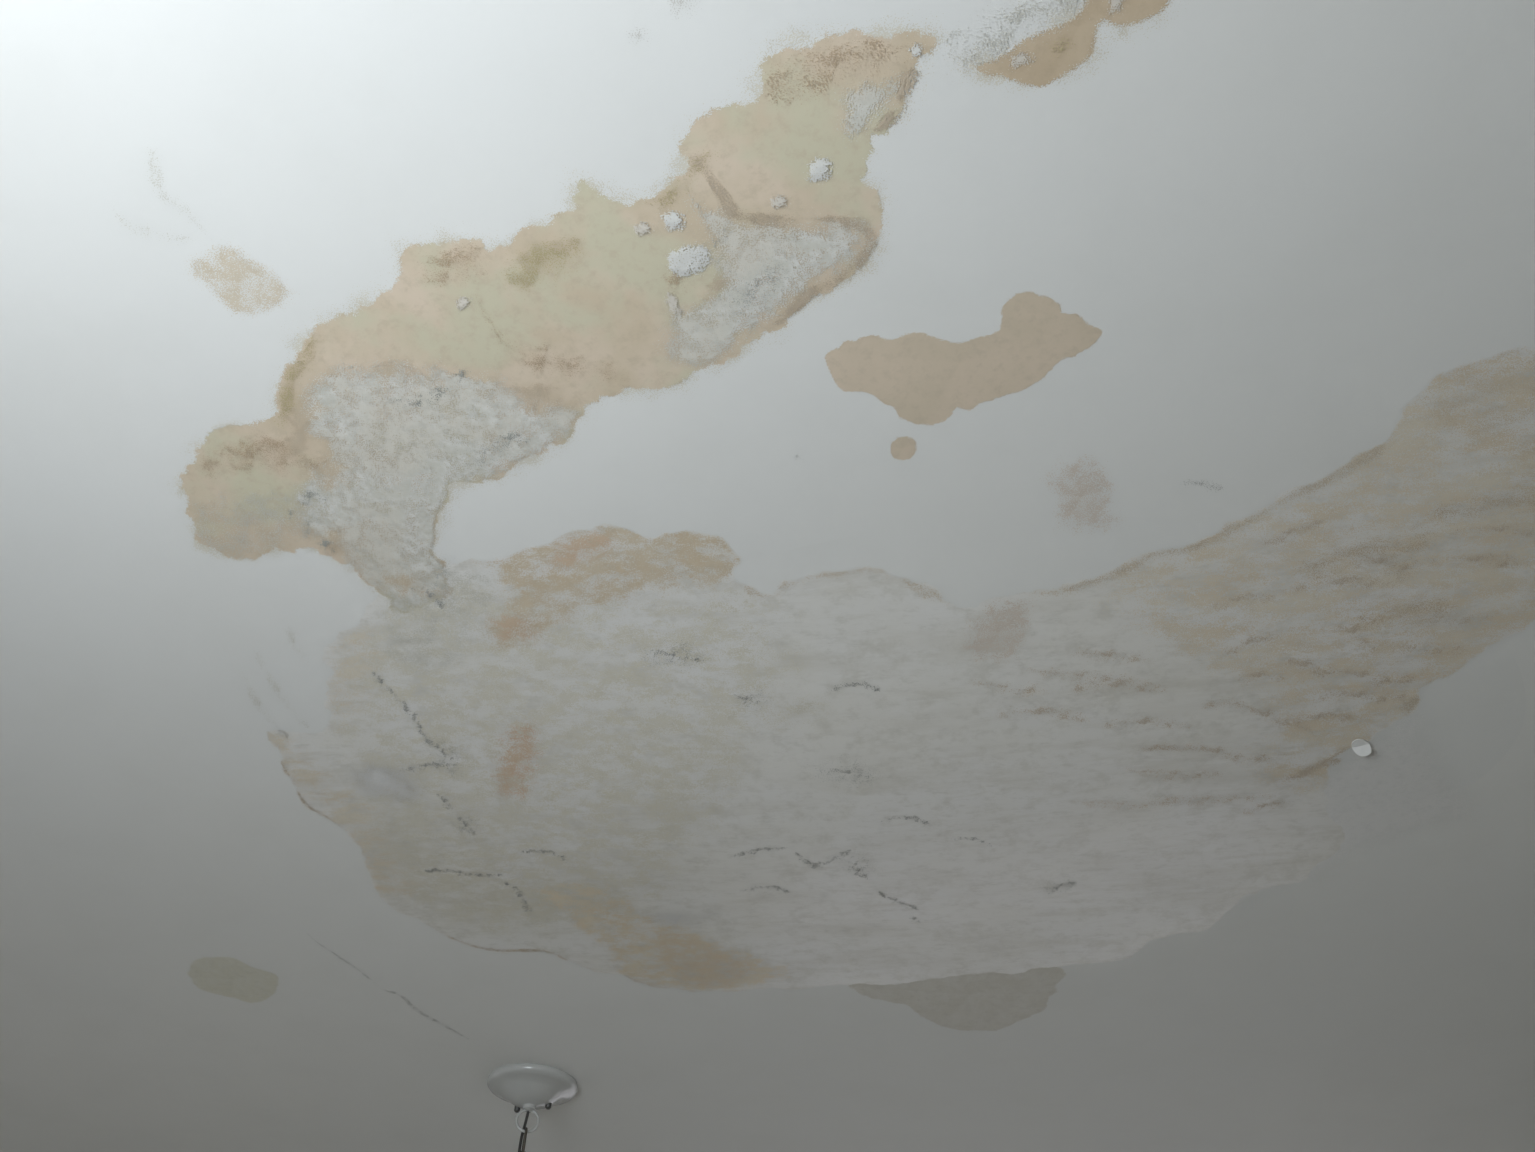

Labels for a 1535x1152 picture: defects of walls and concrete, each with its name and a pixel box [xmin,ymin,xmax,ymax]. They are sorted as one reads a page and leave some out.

peeling [163,0,1535,993]